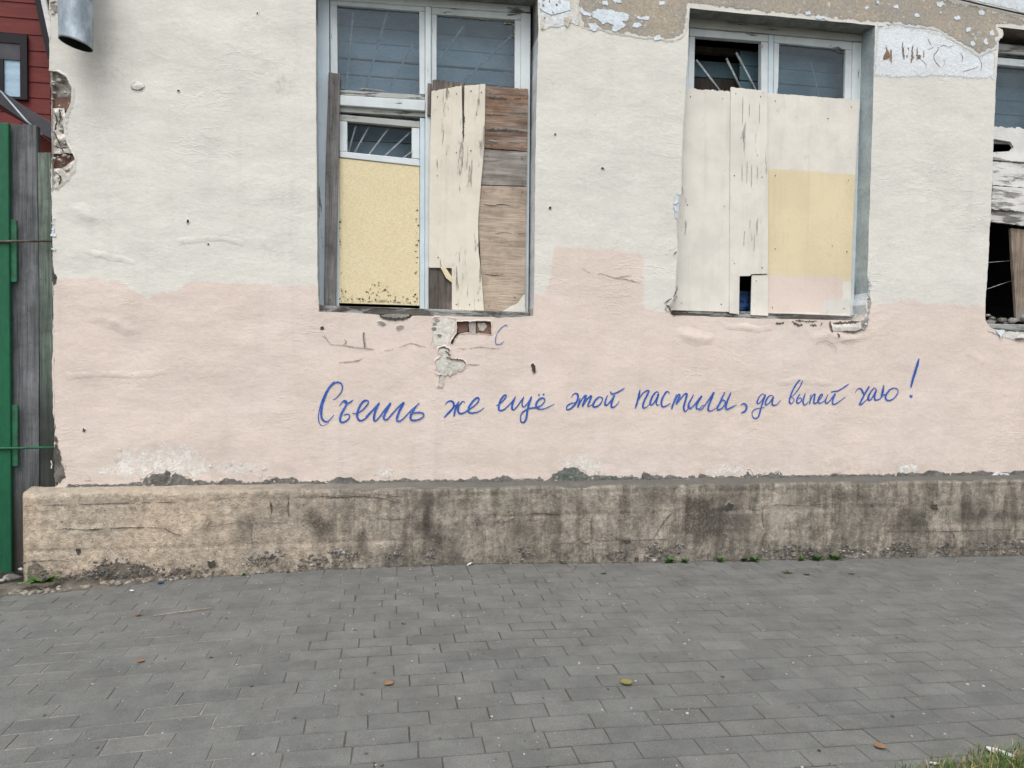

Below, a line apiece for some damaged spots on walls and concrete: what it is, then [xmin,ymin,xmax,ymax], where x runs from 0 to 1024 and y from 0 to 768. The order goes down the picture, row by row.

peeling [539,0,1024,80]
flaking render [50,70,77,195]
flaking render [430,315,493,389]
spalling [51,436,66,483]
spalling [140,469,221,487]
spalling [253,475,329,484]
crack [20,502,181,536]